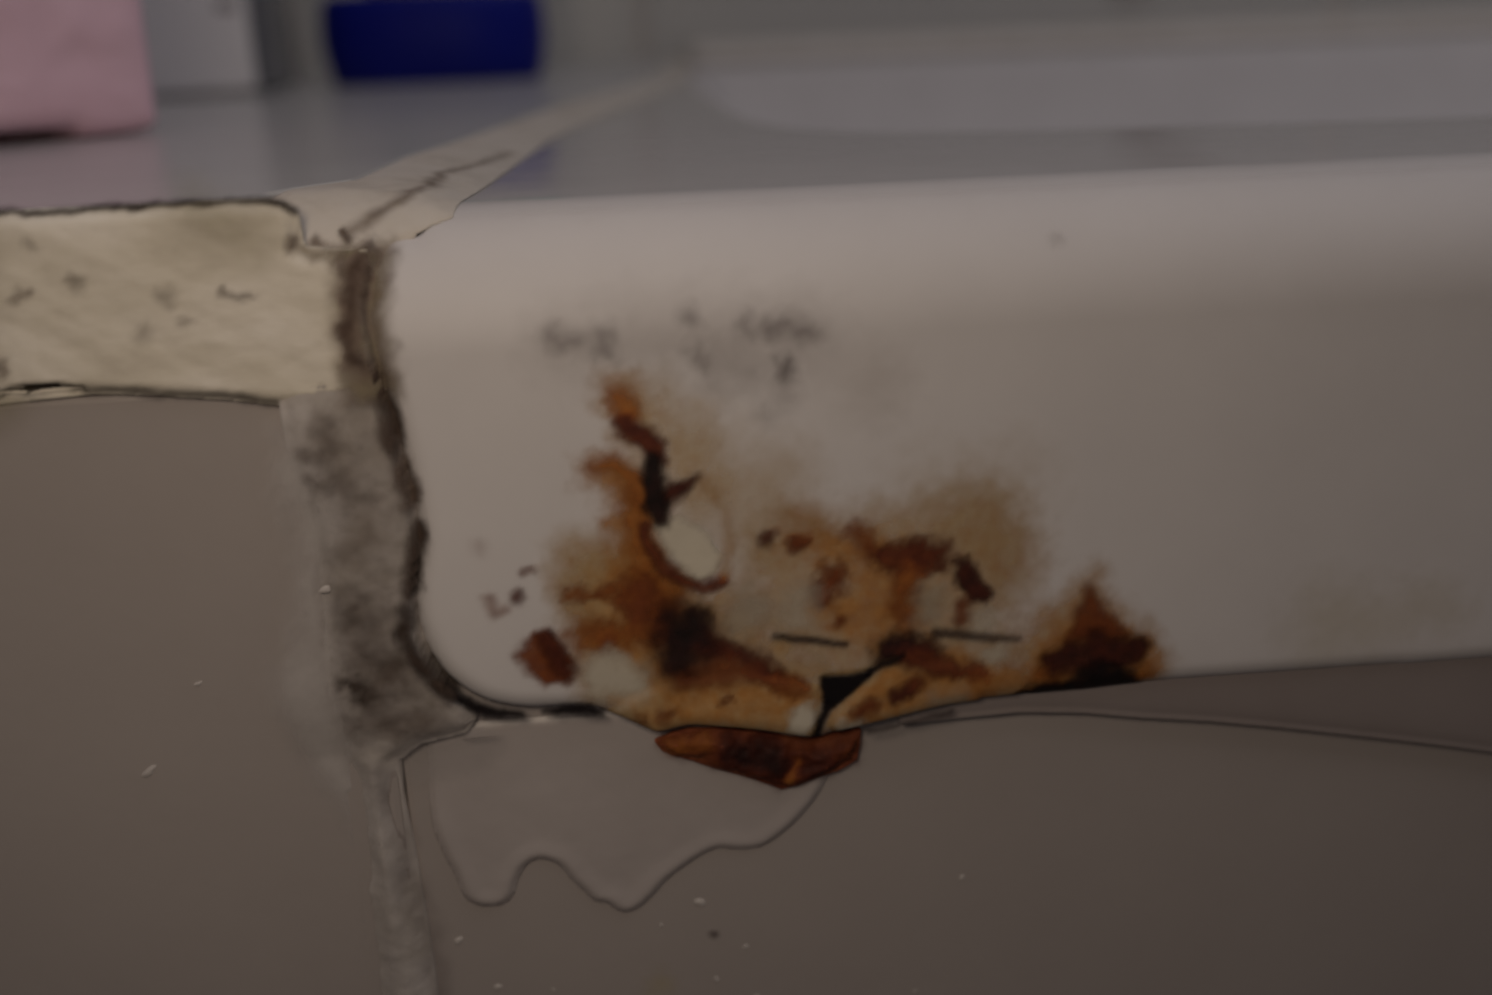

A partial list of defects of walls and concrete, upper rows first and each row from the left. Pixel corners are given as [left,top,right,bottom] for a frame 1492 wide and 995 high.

mould [289,229,457,705]
corrosion [516,384,1164,789]